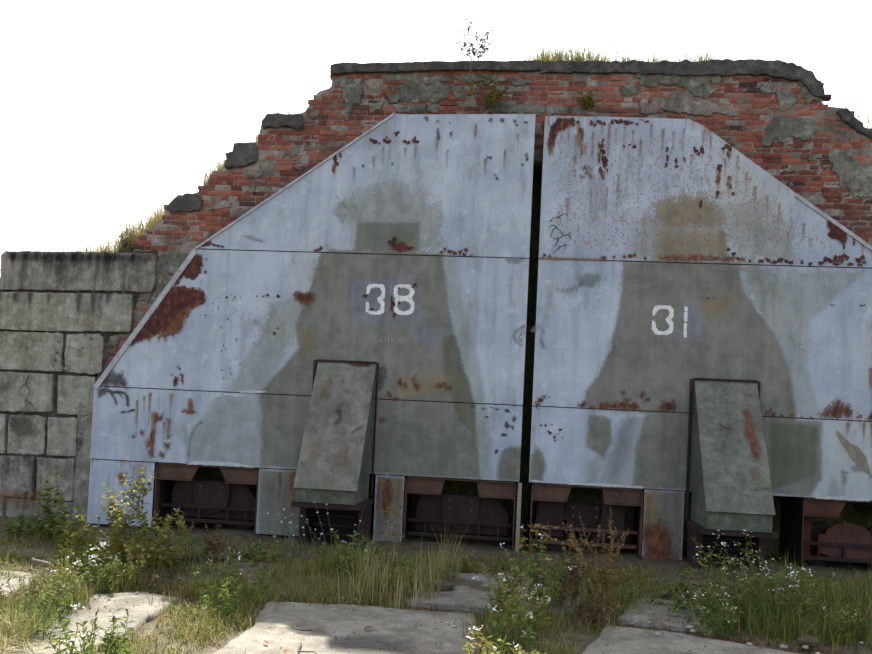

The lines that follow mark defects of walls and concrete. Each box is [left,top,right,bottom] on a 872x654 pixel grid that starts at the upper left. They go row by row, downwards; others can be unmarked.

peeling [369,131,419,145]
peeling [338,73,532,140]
rust [561,122,611,180]
peeling [484,73,740,154]
peeling [665,146,704,168]
peeling [760,81,820,146]
peeling [808,149,872,198]
peeling [726,220,867,267]
rust [132,393,171,459]
rust [742,409,761,459]
rust [765,400,872,431]